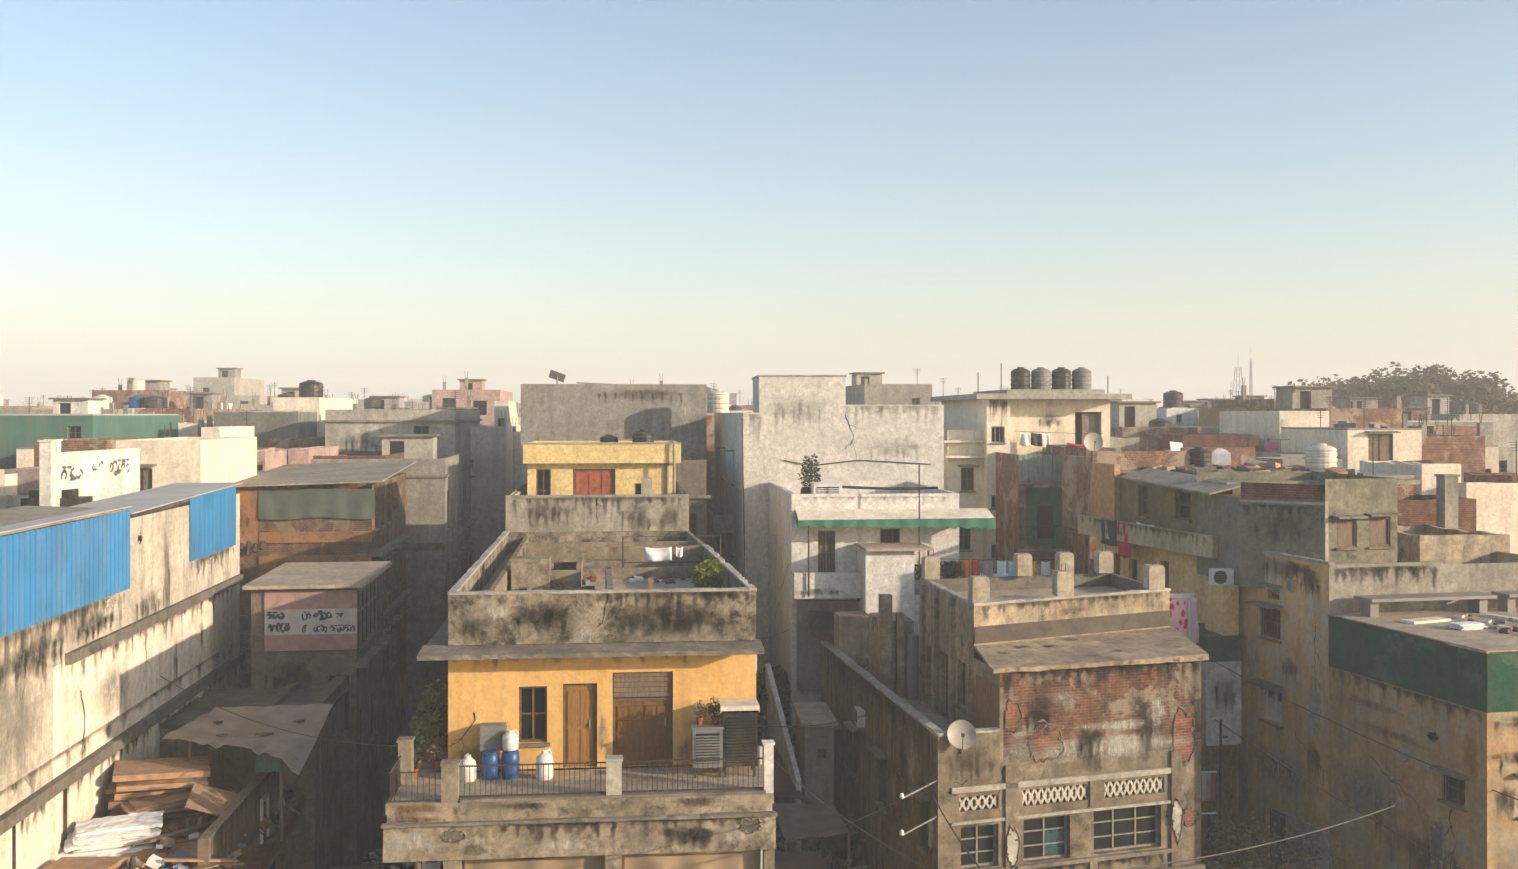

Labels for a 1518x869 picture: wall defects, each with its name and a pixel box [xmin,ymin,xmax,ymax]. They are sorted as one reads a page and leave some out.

damp [0,568,232,683]
damp [463,606,595,638]
damp [611,592,748,631]
flaking render [1004,698,1065,763]
flaking render [1169,706,1196,764]